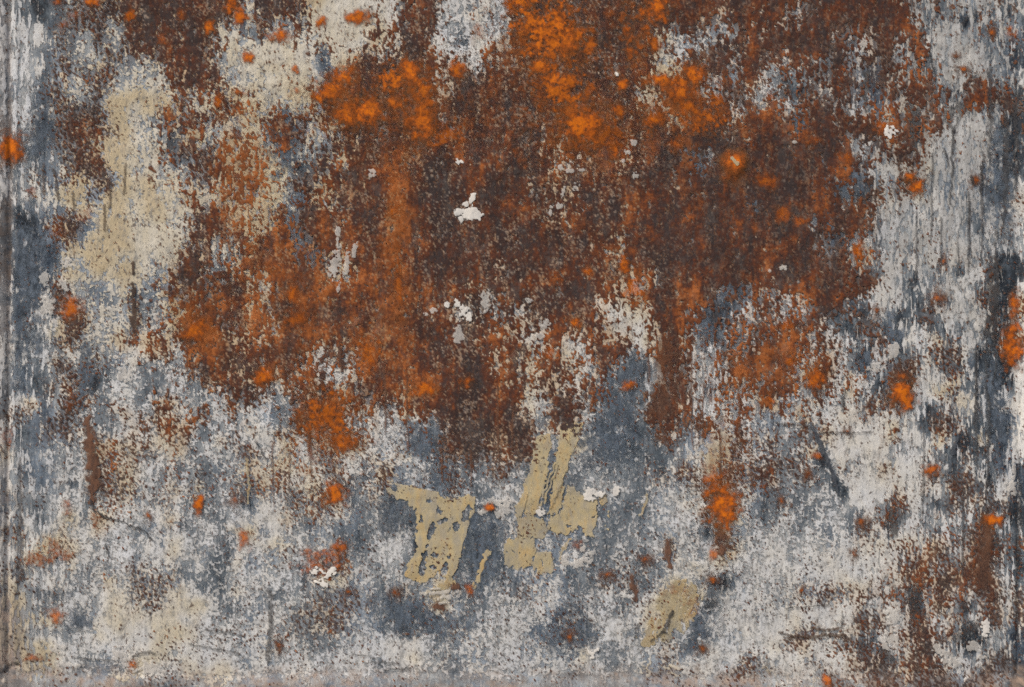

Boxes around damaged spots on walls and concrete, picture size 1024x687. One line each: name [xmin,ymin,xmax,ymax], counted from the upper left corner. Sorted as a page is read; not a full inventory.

corrosion [0,134,24,163]
peeling [400,138,487,245]
peeling [518,102,607,241]
corrosion [955,187,1024,418]